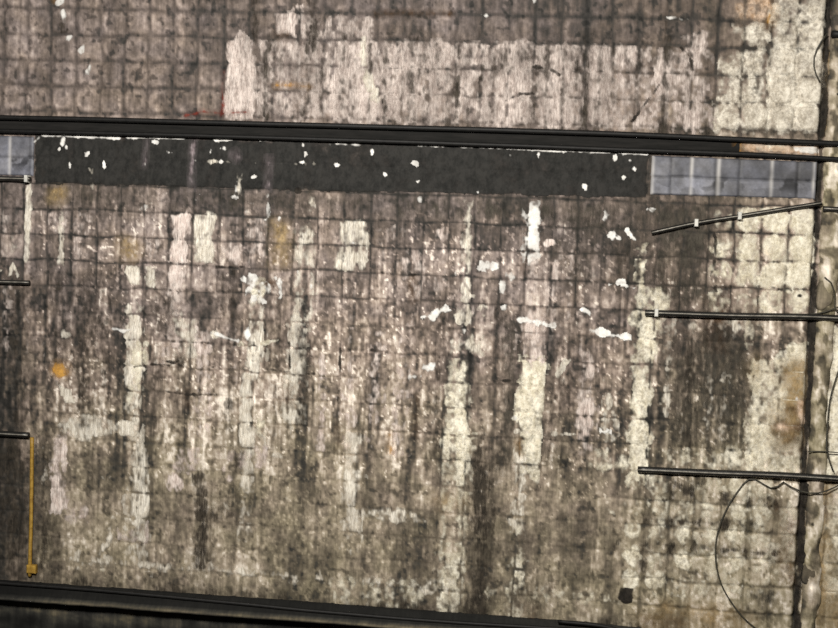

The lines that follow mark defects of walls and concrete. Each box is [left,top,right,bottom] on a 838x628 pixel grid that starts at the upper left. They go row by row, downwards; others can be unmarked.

peeling [42,134,185,151]
damp [123,304,154,558]
damp [162,211,241,376]
damp [224,285,267,492]
damp [283,230,315,430]
damp [335,221,369,272]
damp [432,359,494,615]
peeling [483,147,567,158]
peeling [222,0,830,135]
damp [501,203,559,534]
peeling [579,150,649,171]
damp [576,204,818,485]